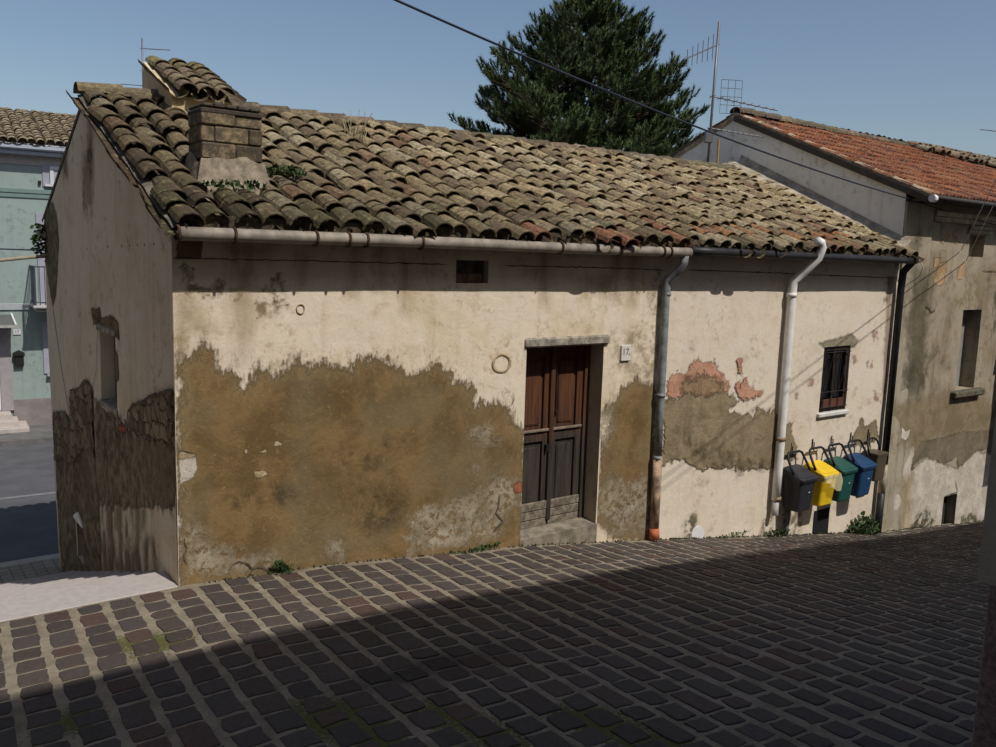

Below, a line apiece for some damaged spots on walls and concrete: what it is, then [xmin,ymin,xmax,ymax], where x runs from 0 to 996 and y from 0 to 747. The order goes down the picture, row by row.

damp [894,274,992,448]
flaking render [56,340,524,586]
flaking render [597,356,797,541]
damp [911,509,935,528]
flaking render [911,429,994,470]